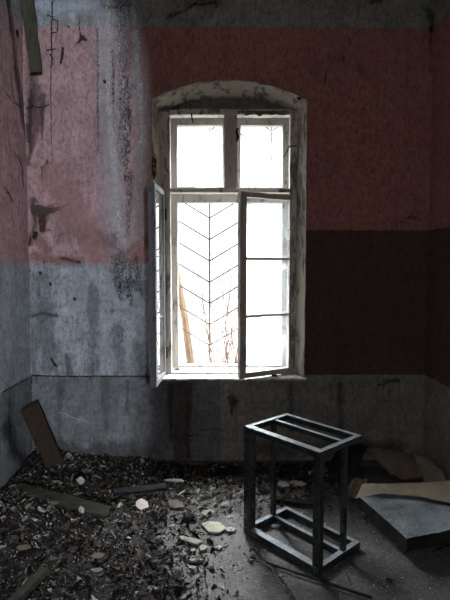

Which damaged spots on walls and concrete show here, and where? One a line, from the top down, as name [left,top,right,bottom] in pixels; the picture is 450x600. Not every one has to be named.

crack [6,0,58,181]
damp [97,0,144,242]
flaking render [28,203,70,246]
damp [111,250,143,304]